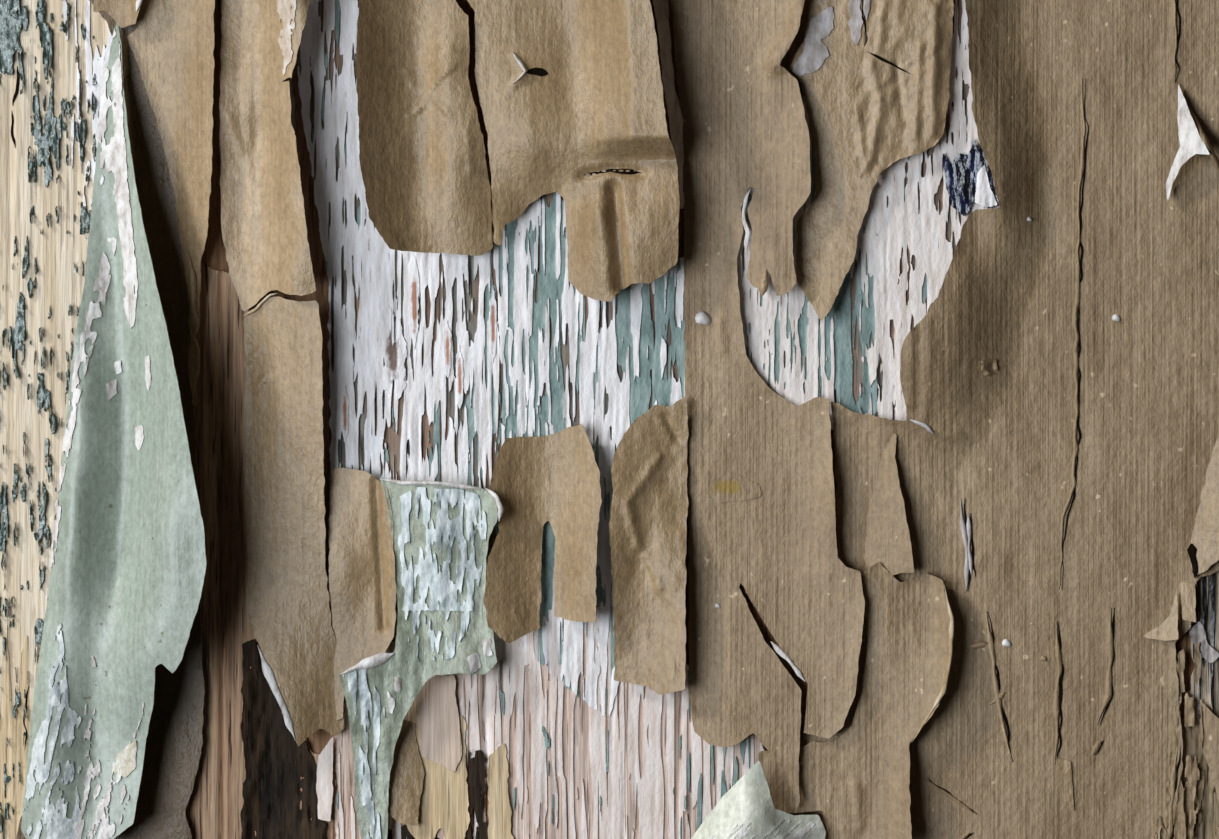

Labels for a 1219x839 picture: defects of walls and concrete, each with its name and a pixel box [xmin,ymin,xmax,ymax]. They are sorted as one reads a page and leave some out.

peeling [0,0,215,839]
peeling [219,0,954,839]
peeling [670,0,1219,839]
crack [1053,621,1064,764]
crack [1058,81,1088,590]
crack [1091,608,1115,755]